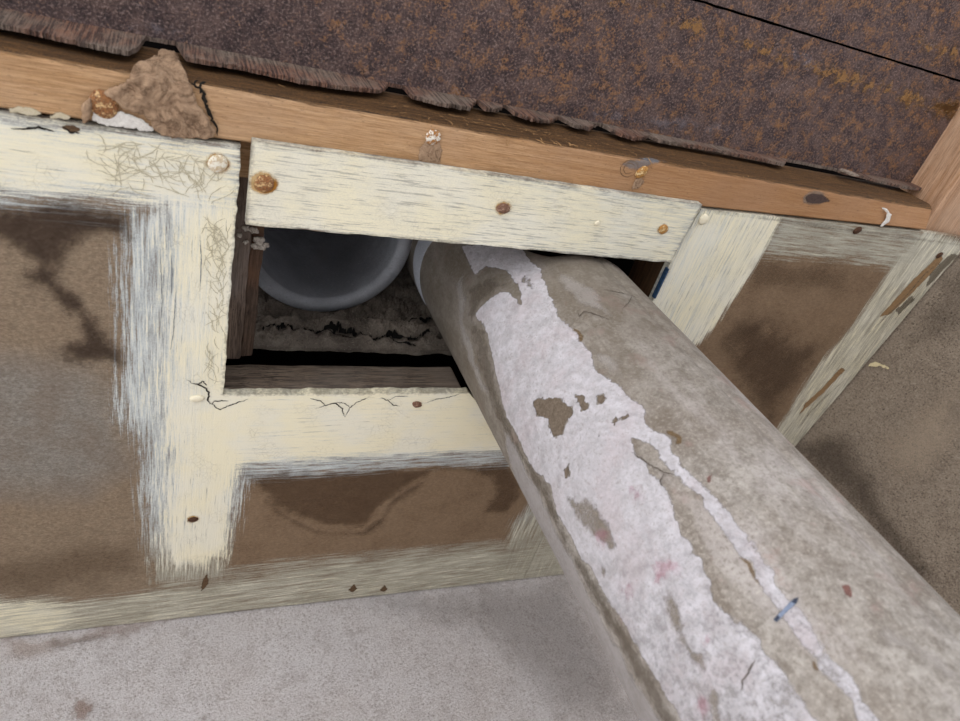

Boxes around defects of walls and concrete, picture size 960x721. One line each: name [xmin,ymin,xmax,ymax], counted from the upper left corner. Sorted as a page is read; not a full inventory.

rust [735,39,960,120]
peeling [92,111,153,132]
crack [189,80,218,136]
rust [251,172,278,194]
crack [11,126,248,410]
crack [262,317,439,346]
crack [310,396,407,417]
spalling [533,395,605,437]
peeling [800,368,845,413]
damp [462,245,878,721]